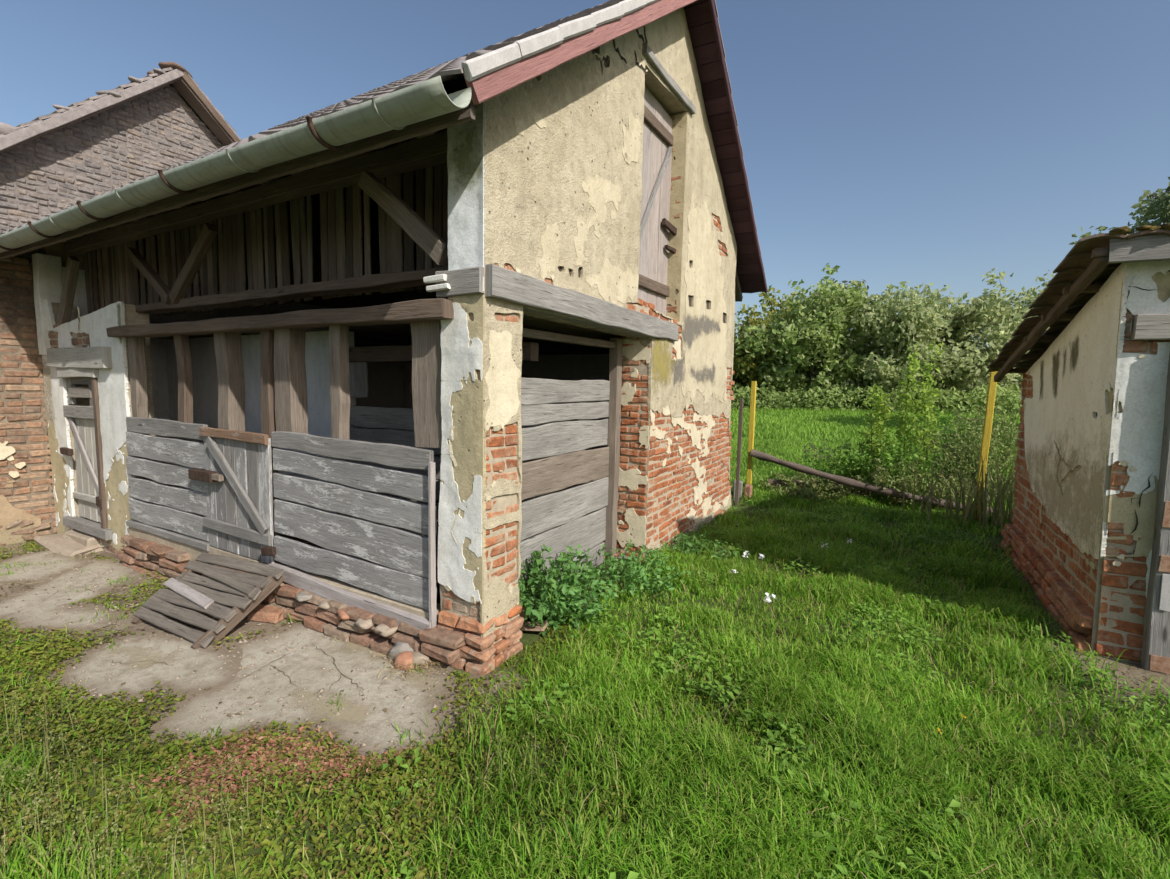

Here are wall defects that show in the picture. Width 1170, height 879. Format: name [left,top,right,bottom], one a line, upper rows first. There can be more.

crack [595,26,648,75]
spalling [539,112,735,562]
leakage [1040,337,1078,396]
spalling [1116,270,1170,358]
peeling [0,419,71,546]
peeling [437,302,521,632]
leakage [1027,448,1104,554]
spalling [1011,372,1158,664]